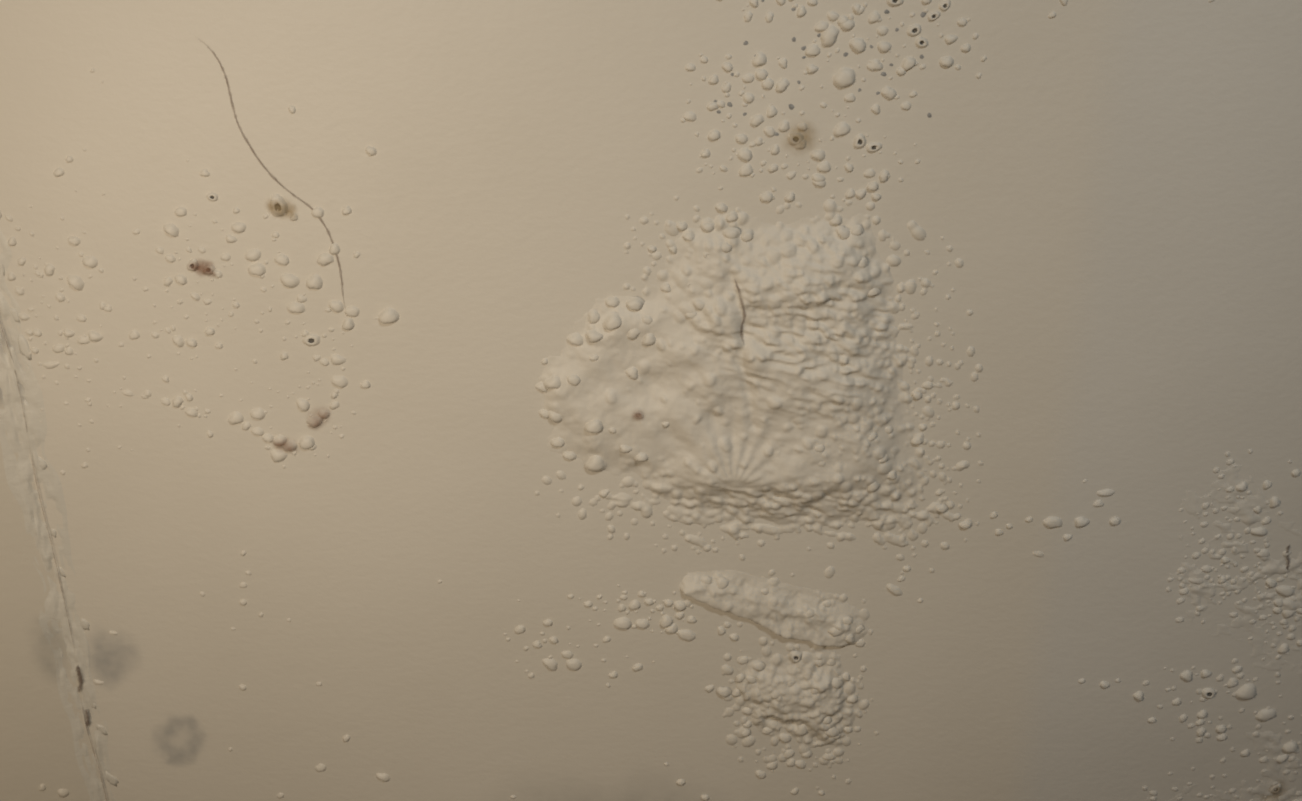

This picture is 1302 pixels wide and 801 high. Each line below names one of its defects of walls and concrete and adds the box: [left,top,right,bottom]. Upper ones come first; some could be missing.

crack [0,211,119,801]